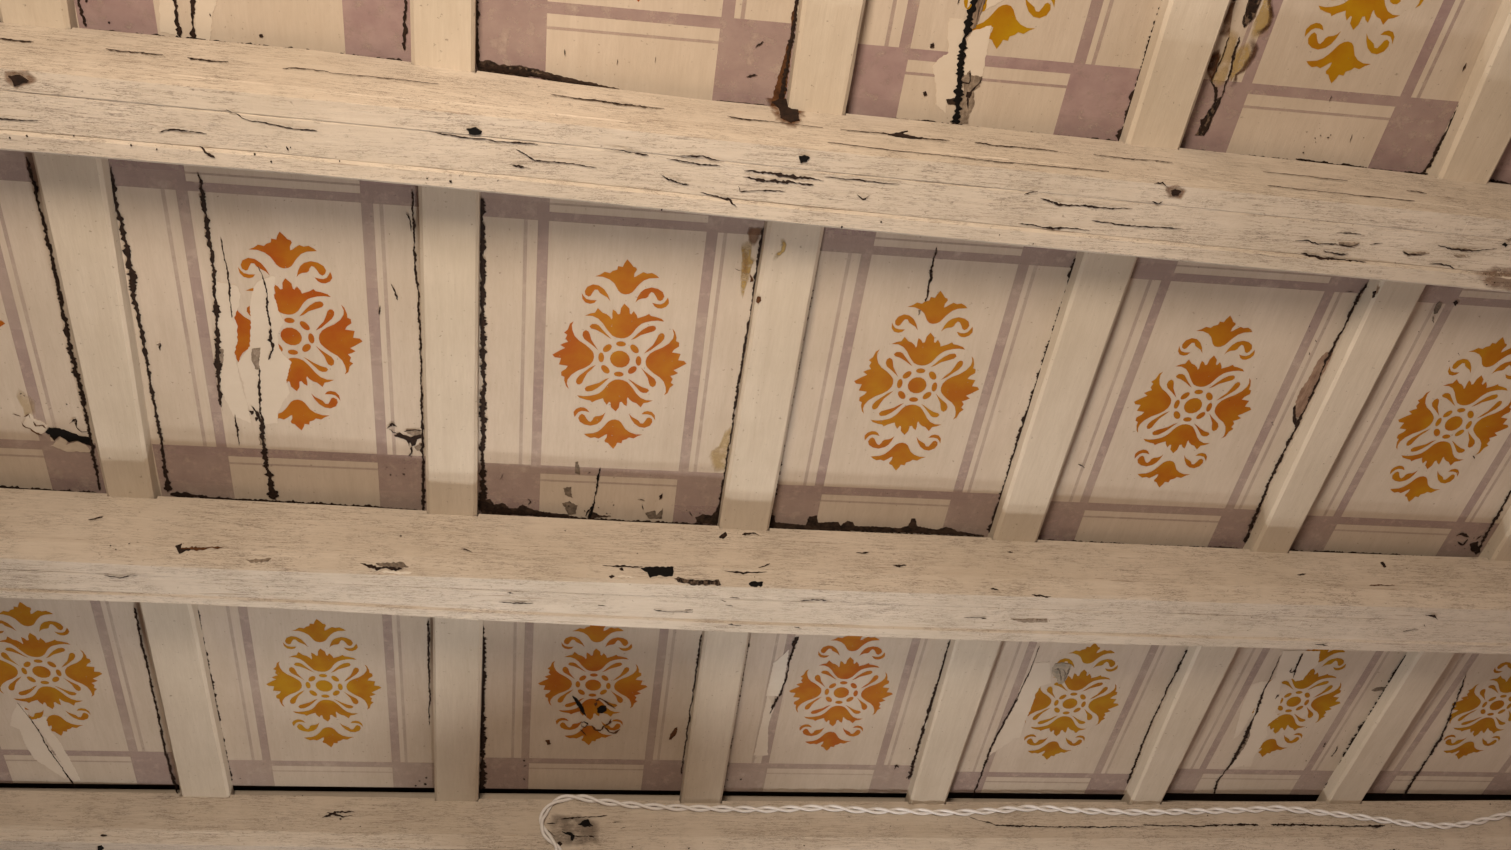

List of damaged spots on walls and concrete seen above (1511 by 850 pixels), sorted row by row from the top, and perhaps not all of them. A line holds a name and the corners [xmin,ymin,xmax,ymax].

crack [105,0,228,62]
crack [283,67,438,84]
crack [433,0,1180,230]
crack [1195,37,1240,136]
crack [161,109,316,499]
peeling [990,704,1026,755]
crack [964,617,1466,828]